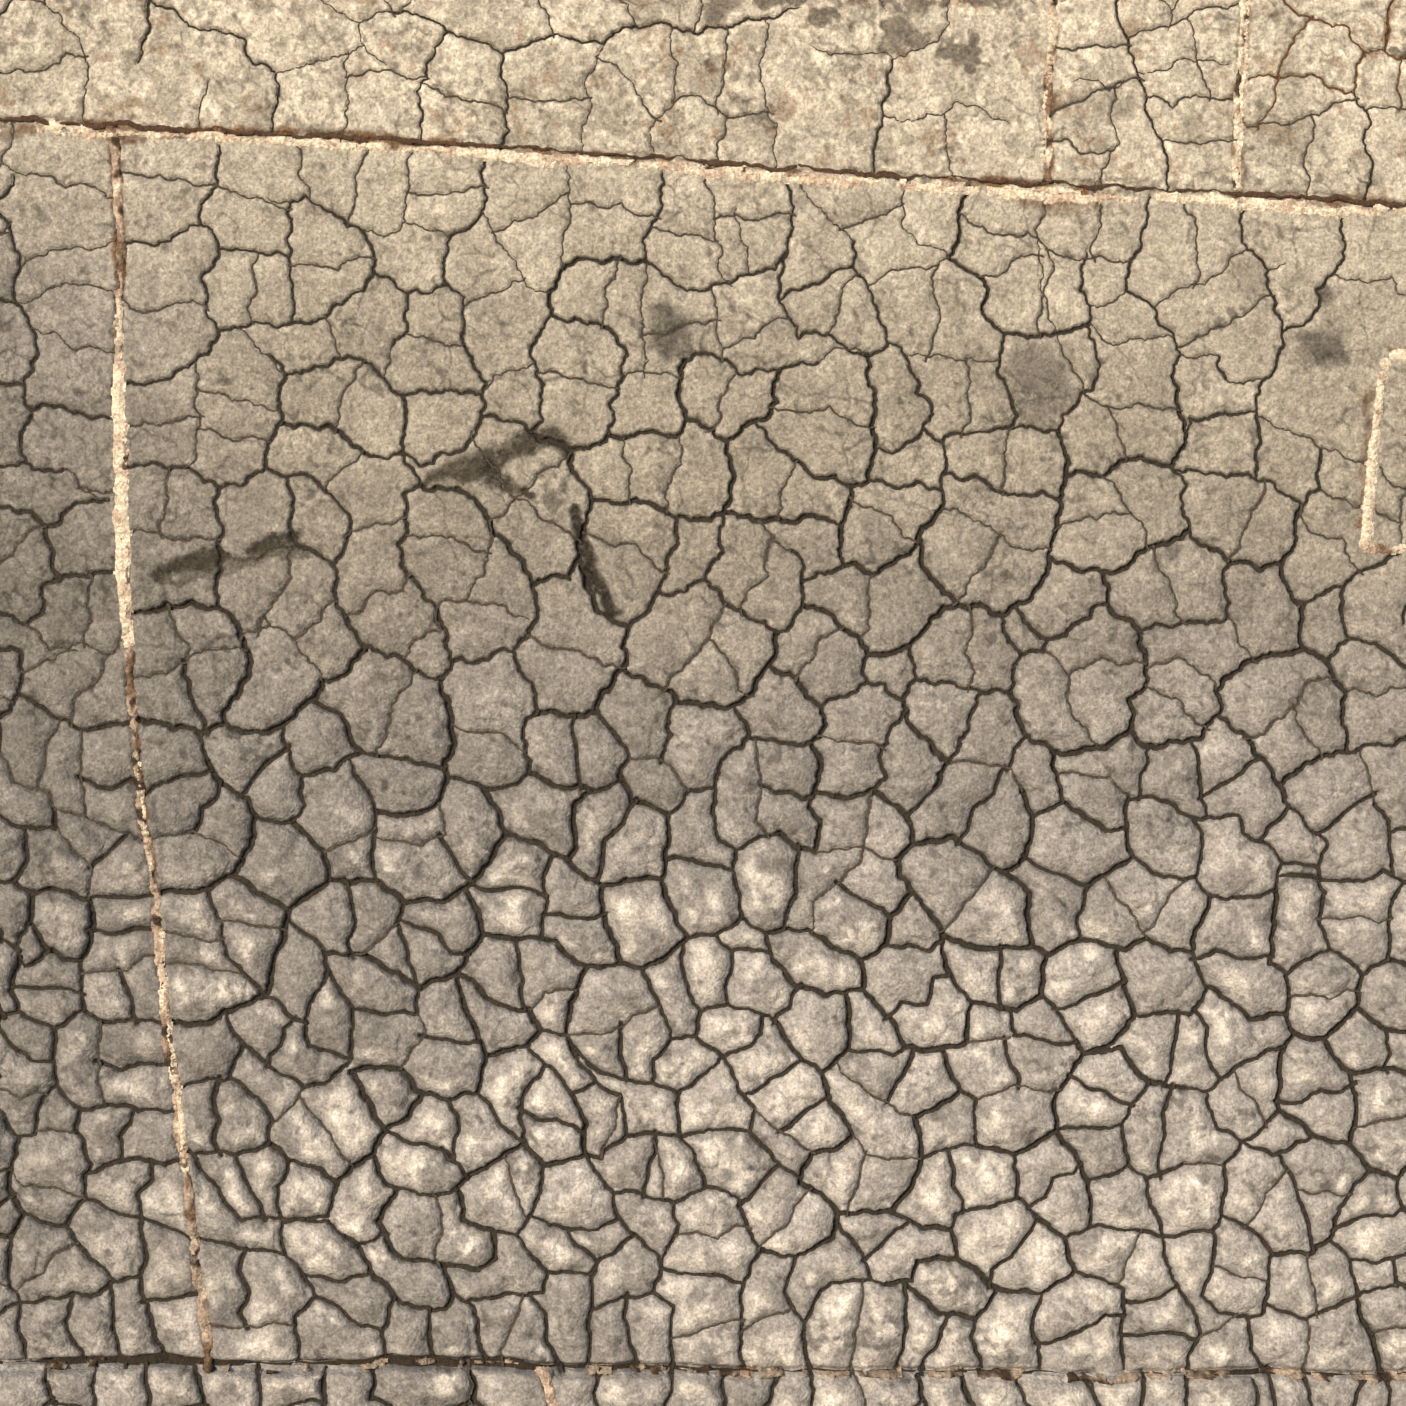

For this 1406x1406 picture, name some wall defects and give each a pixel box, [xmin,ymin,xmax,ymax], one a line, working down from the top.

crack [0,0,89,126]
crack [0,121,114,200]
crack [137,0,802,169]
crack [811,0,1010,180]
crack [1049,0,1239,193]
crack [1244,0,1406,201]
crack [0,213,198,1369]
crack [121,145,1405,1376]
crack [43,1368,97,1406]
crack [255,1368,328,1406]
crack [455,1359,484,1406]
crack [914,1375,928,1406]